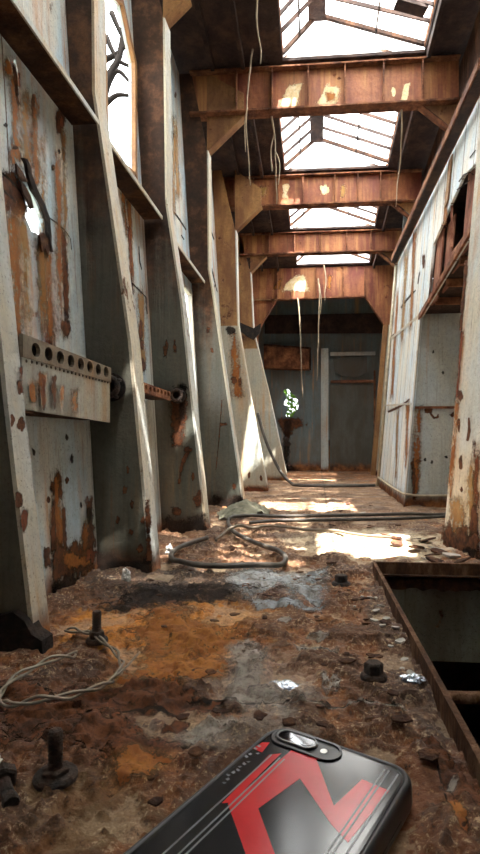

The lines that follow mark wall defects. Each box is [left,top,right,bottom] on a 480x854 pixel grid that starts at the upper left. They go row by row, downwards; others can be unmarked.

peeling [281,83,302,107]
peeling [317,85,339,105]
peeling [391,83,410,100]
corrosion [4,58,71,345]
peeling [273,275,309,293]
corrosion [17,366,79,414]
corrosion [170,384,195,484]
corrosion [216,326,244,467]
corrosion [388,229,439,500]
corrosion [440,259,480,560]
corrosion [47,472,69,553]
corrosion [0,491,260,798]